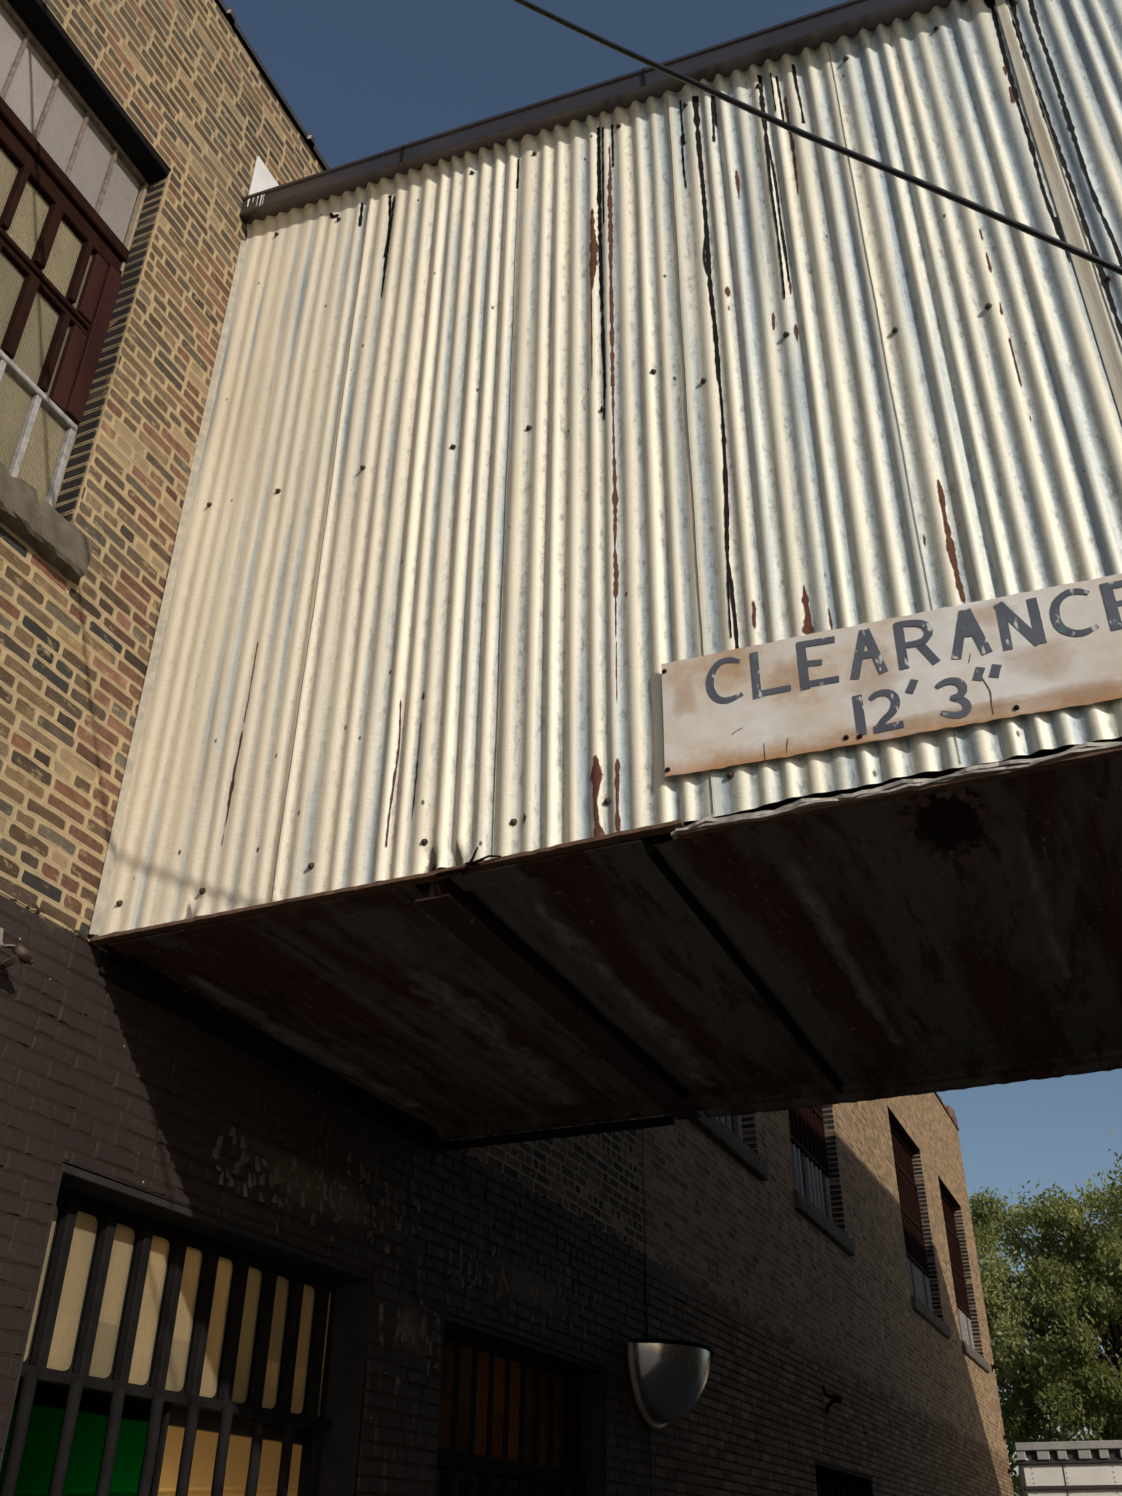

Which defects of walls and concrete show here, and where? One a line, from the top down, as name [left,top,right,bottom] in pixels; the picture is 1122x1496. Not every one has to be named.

rust [589,146,619,697]
rust [937,479,966,603]
rust [802,586,833,635]
rust [91,746,1122,945]
peeling [213,1126,421,1253]